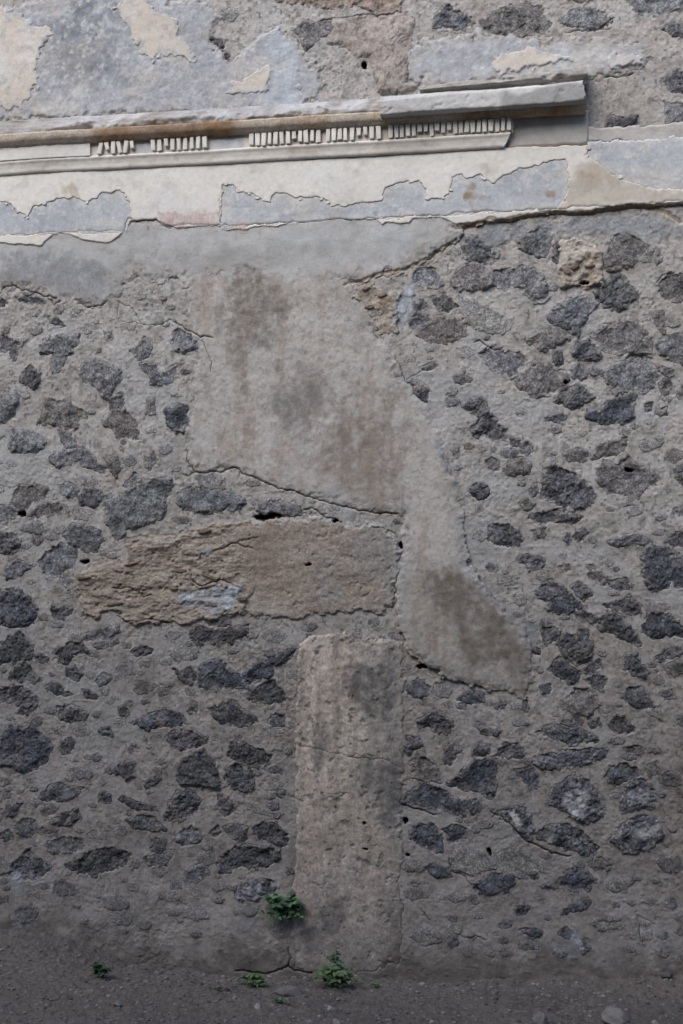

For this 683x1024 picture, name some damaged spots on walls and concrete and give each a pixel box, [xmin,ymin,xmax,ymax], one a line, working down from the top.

flaking render [0,190,131,236]
crack [1,198,682,286]
flaking render [220,160,569,230]
flaking render [586,135,683,190]
crack [183,451,398,535]
crack [236,949,313,974]